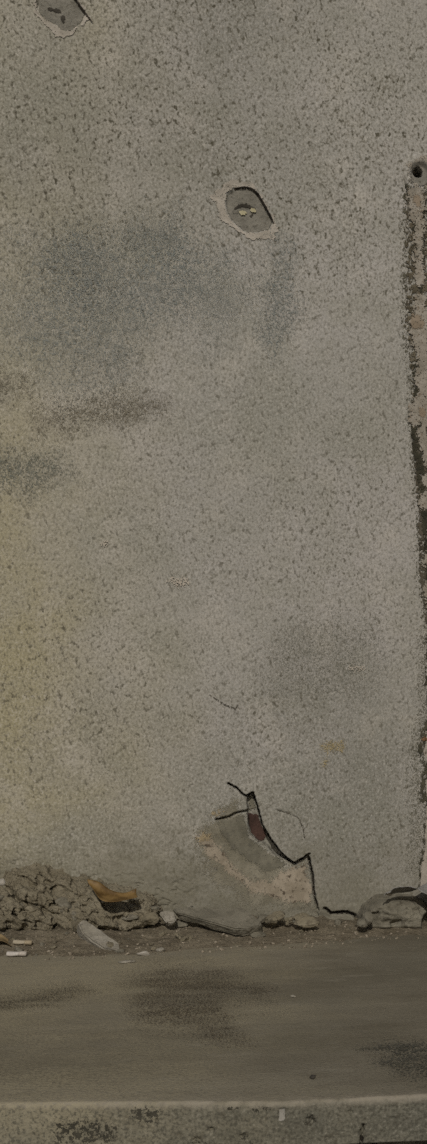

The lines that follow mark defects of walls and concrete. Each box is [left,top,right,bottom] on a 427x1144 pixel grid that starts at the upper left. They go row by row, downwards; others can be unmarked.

spalling [33,0,93,38]
spalling [209,179,278,241]
spalling [190,787,315,913]